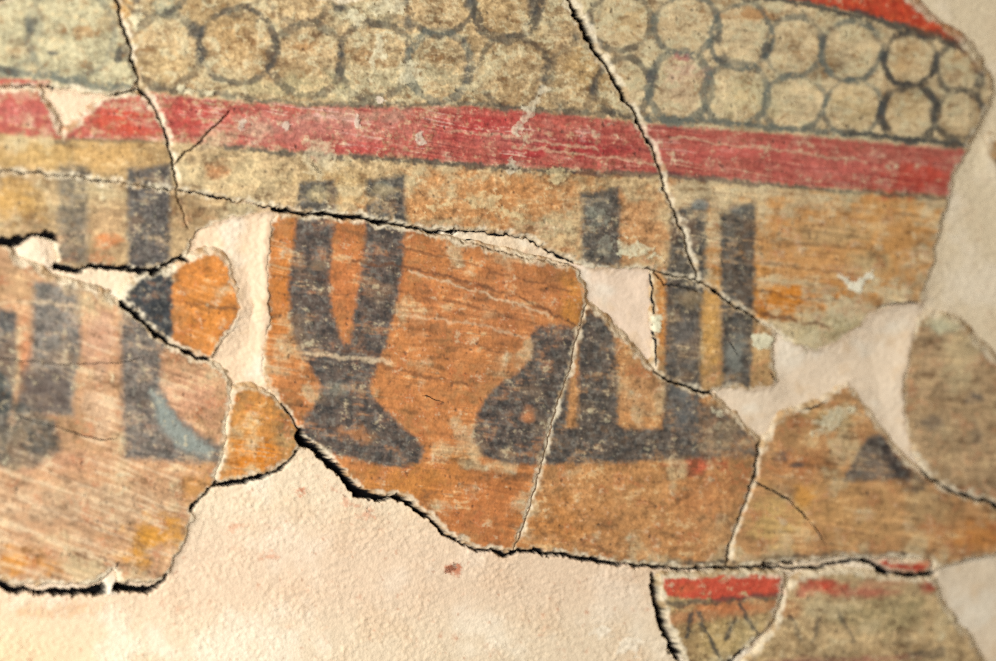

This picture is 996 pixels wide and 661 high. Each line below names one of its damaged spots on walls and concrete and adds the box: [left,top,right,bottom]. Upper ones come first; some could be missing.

crack [569,7,591,50]
crack [0,0,573,266]
crack [0,301,207,366]
crack [52,256,182,274]
spalling [189,206,283,391]
spalling [571,201,665,360]
crack [649,215,753,393]
crack [212,467,278,485]
crack [294,305,929,658]
spalling [927,554,996,661]